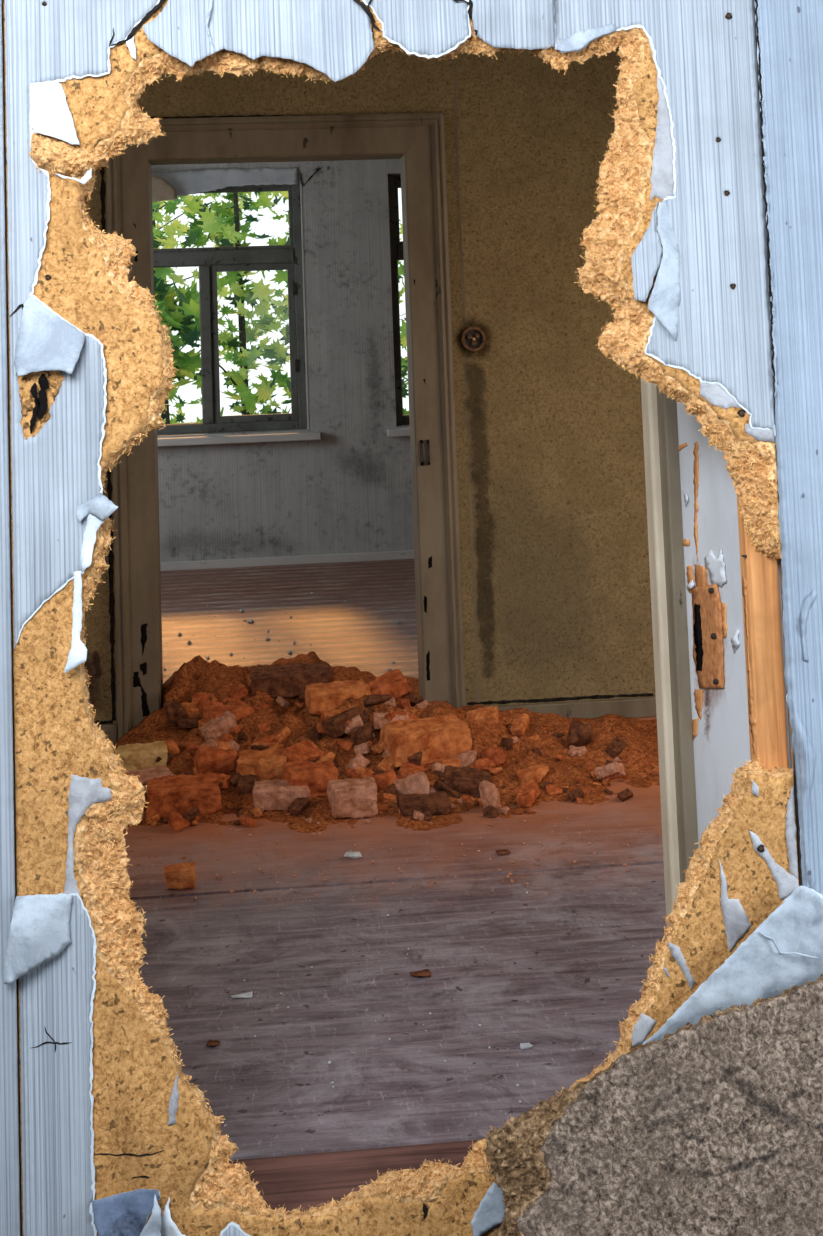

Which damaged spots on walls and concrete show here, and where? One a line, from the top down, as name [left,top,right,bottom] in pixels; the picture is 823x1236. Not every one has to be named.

crack [354,0,383,42]
spalling [19,370,63,440]
leakage [84,651,101,703]
spalling [80,517,113,645]
spalling [79,49,333,484]
leakage [466,365,494,676]
spalling [358,27,781,593]
spalling [74,576,823,1236]